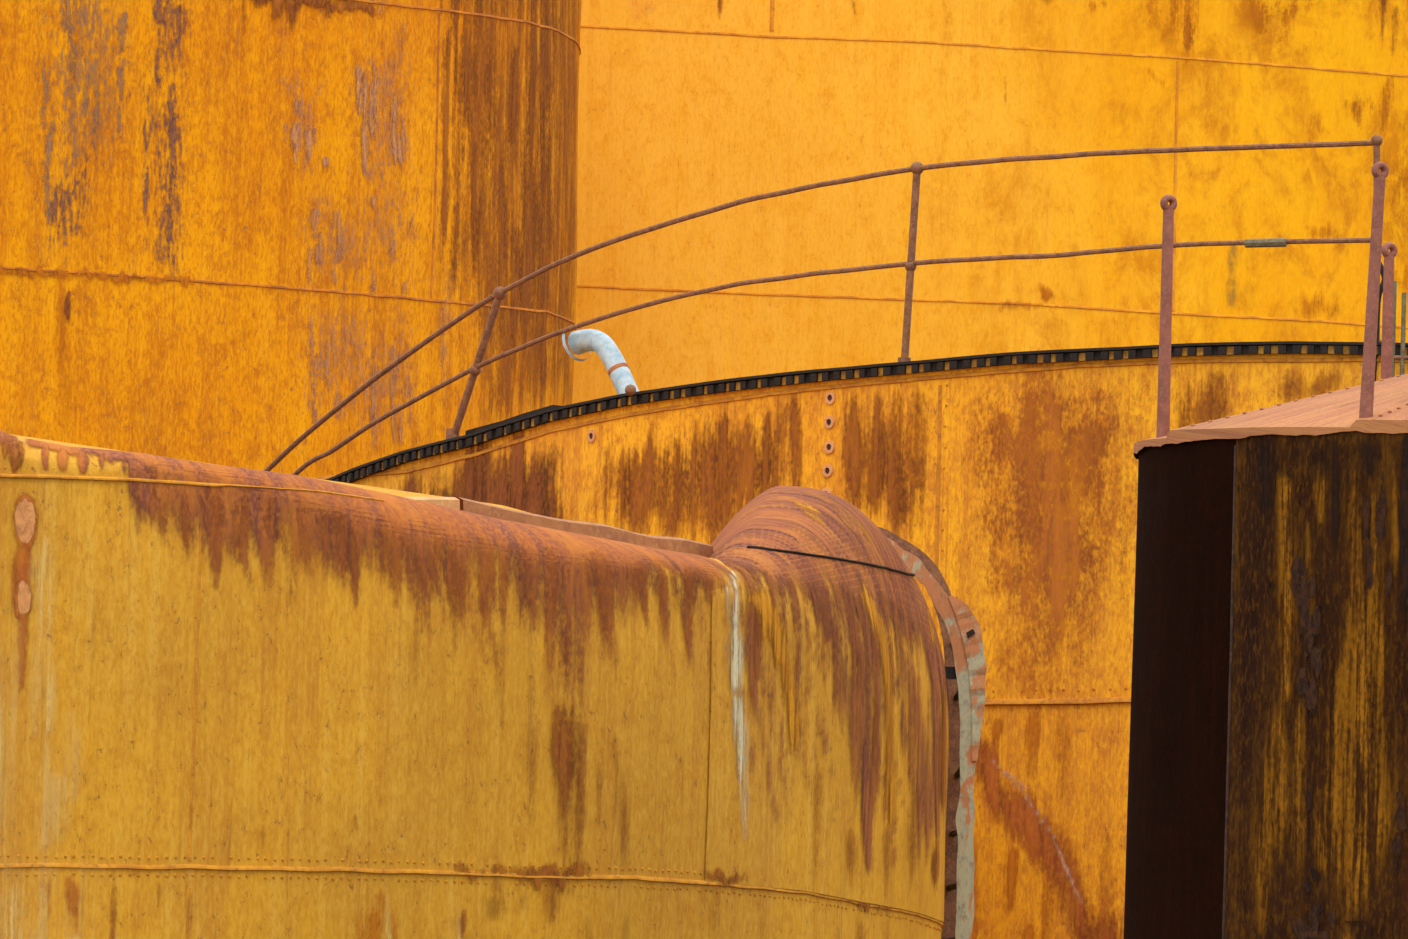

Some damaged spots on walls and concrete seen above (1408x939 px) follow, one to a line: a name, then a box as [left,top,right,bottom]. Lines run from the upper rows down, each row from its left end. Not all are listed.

rust [254,0,375,28]
rust [1249,0,1297,29]
rust [441,0,580,418]
rust [0,264,190,364]
rust [1028,287,1052,307]
rust [1180,375,1226,428]
rust [1279,374,1335,400]
rust [1399,436,1408,615]
rust [0,396,950,919]
damp [727,571,747,824]
rust [975,714,1117,939]